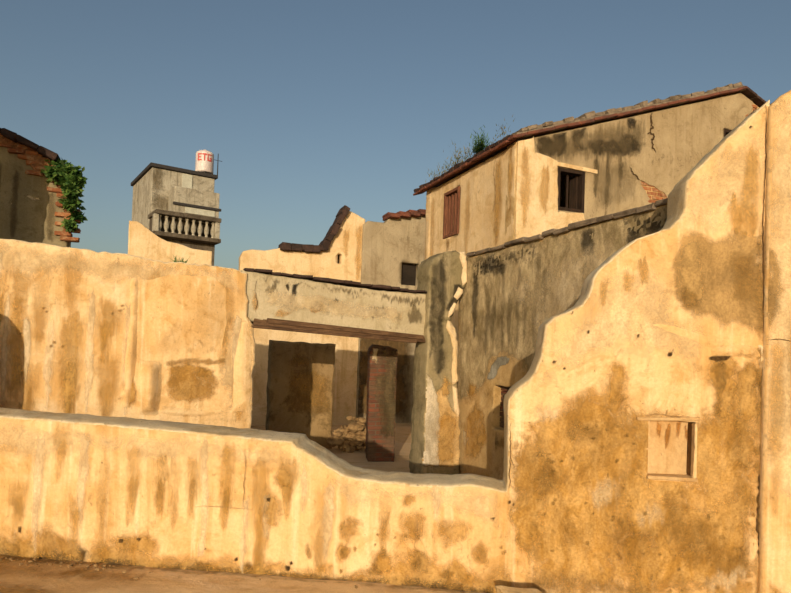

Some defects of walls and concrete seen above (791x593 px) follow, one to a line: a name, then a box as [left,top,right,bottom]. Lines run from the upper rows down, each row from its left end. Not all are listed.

flaking render [0,134,82,243]
leakage [495,149,512,238]
leakage [538,118,640,202]
crack [648,114,656,153]
flaking render [641,182,667,203]
leakage [674,150,780,329]
leakage [442,206,667,399]
leakage [167,316,241,403]
leakage [0,438,79,559]
leakage [91,503,291,576]
leakage [437,414,456,461]
leakage [509,356,759,593]